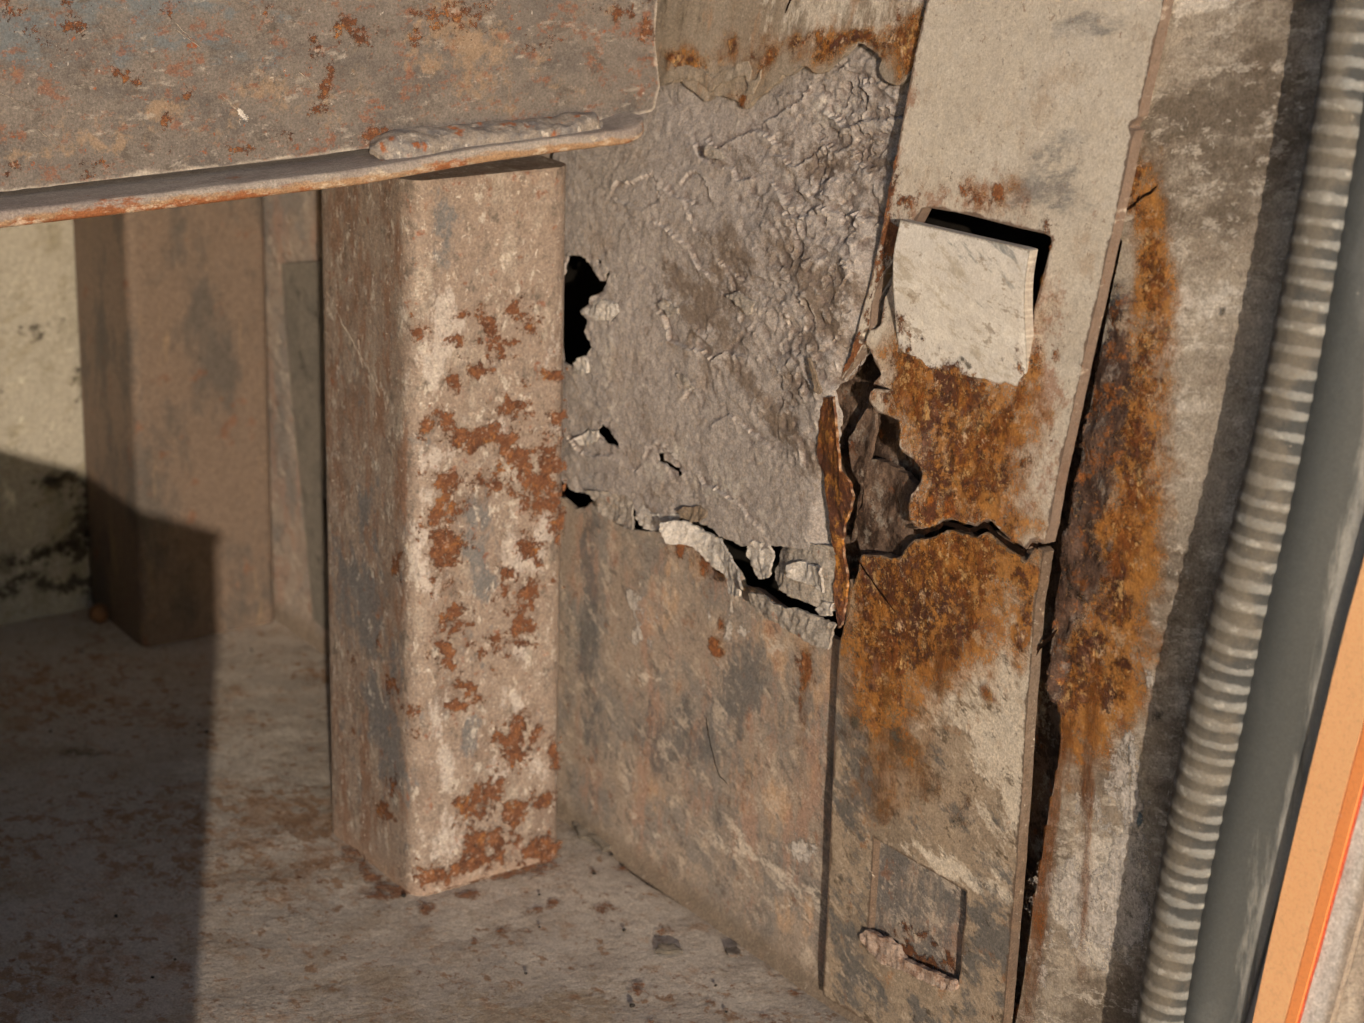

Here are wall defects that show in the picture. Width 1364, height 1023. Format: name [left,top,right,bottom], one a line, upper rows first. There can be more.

rust [1,0,88,51]
rust [307,12,380,124]
rust [403,0,494,48]
rust [593,0,658,43]
rust [750,8,925,79]
peeling [552,43,910,650]
rust [410,291,568,717]
rust [841,146,1059,825]
crack [913,521,1039,556]
rust [1026,165,1179,980]
crack [1036,629,1058,656]
rust [340,708,565,920]